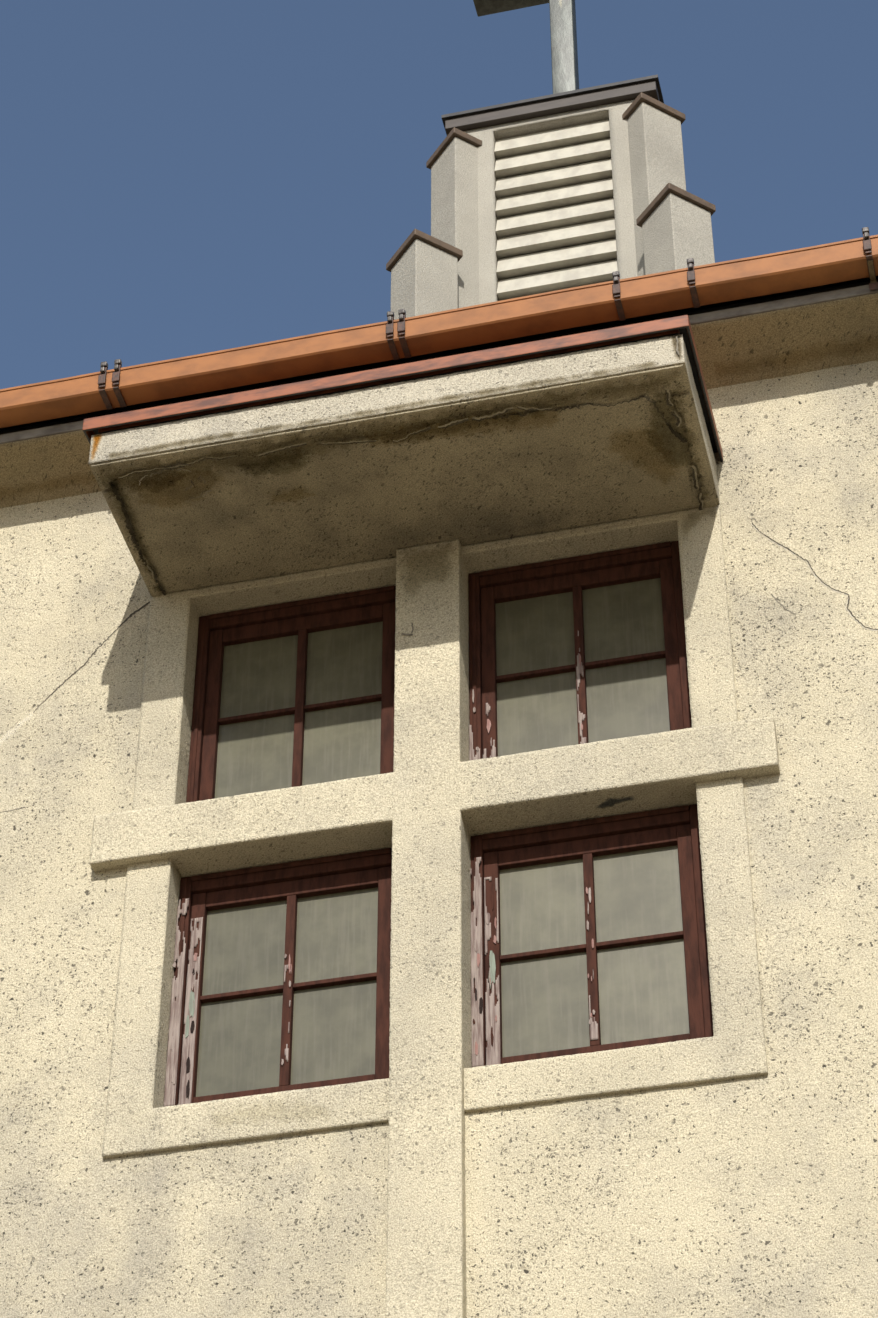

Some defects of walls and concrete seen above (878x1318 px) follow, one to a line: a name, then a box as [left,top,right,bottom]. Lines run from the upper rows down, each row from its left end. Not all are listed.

crack [751,518,878,631]
peeling [469,689,496,761]
peeling [163,898,203,1107]
peeling [470,857,501,1067]